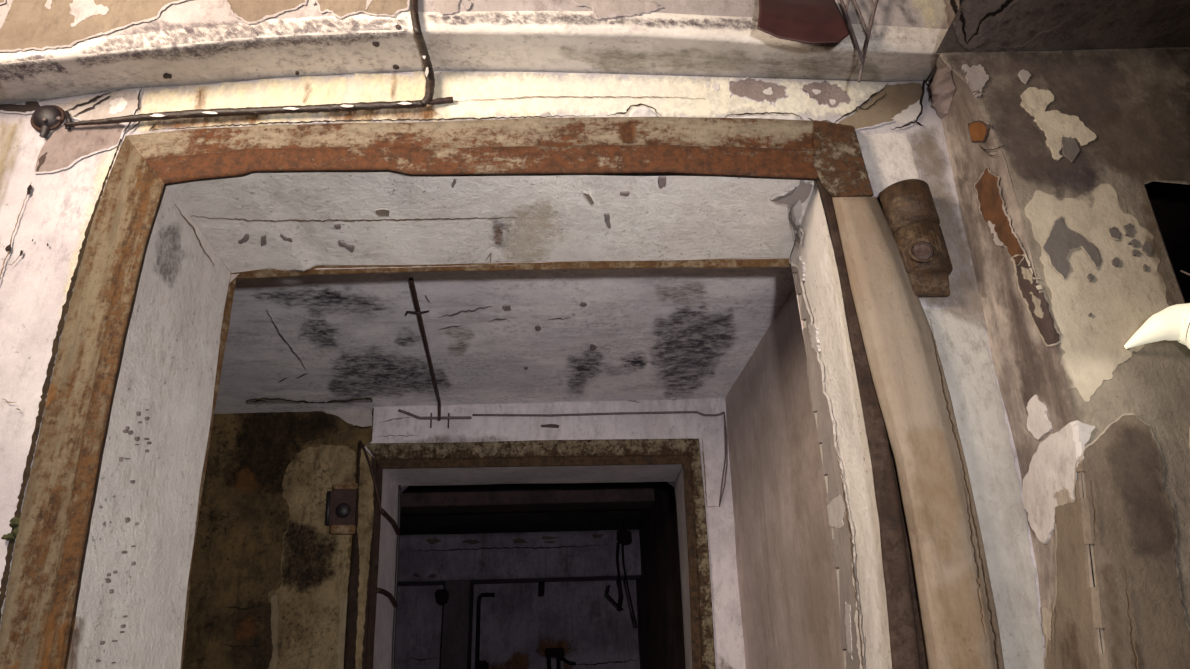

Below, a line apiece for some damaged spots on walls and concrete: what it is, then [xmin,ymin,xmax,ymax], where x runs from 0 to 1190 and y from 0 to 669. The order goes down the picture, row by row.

peeling [0,0,410,80]
crack [950,0,1071,49]
peeling [34,89,165,174]
rust [619,122,636,143]
crack [809,83,888,123]
crack [893,69,934,130]
spalling [974,167,1062,347]
damp [256,289,449,403]
damp [569,285,734,395]
damp [227,412,334,492]
damp [281,520,338,593]
spalling [1042,413,1190,669]